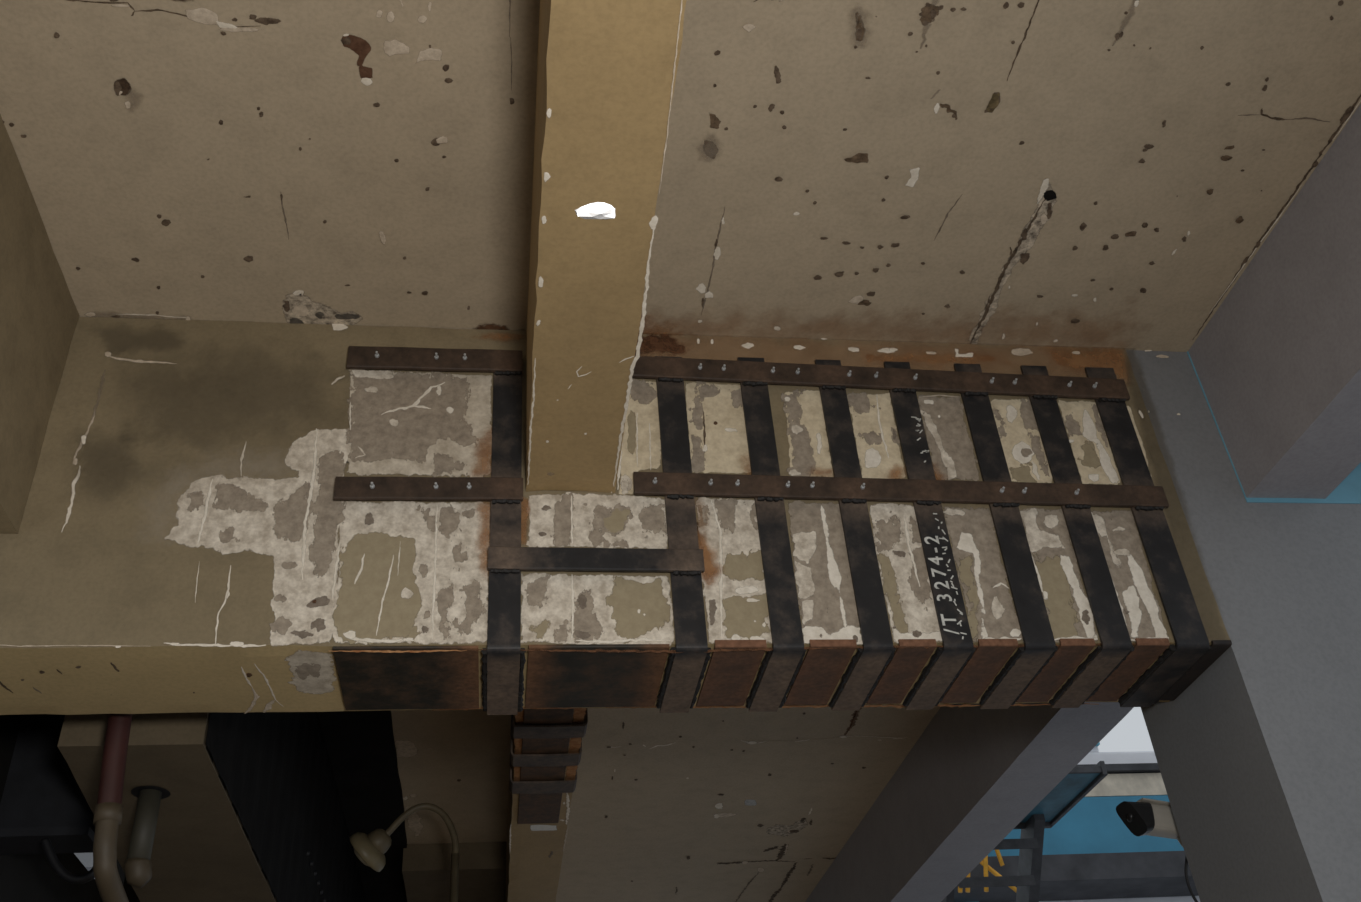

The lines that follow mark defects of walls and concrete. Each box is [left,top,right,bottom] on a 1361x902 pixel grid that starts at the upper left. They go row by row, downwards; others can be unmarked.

crack [68,0,281,35]
crack [955,178,1057,357]
rust [635,321,689,357]
rust [1050,350,1124,379]
crack [62,409,95,531]
peeling [401,587,414,599]